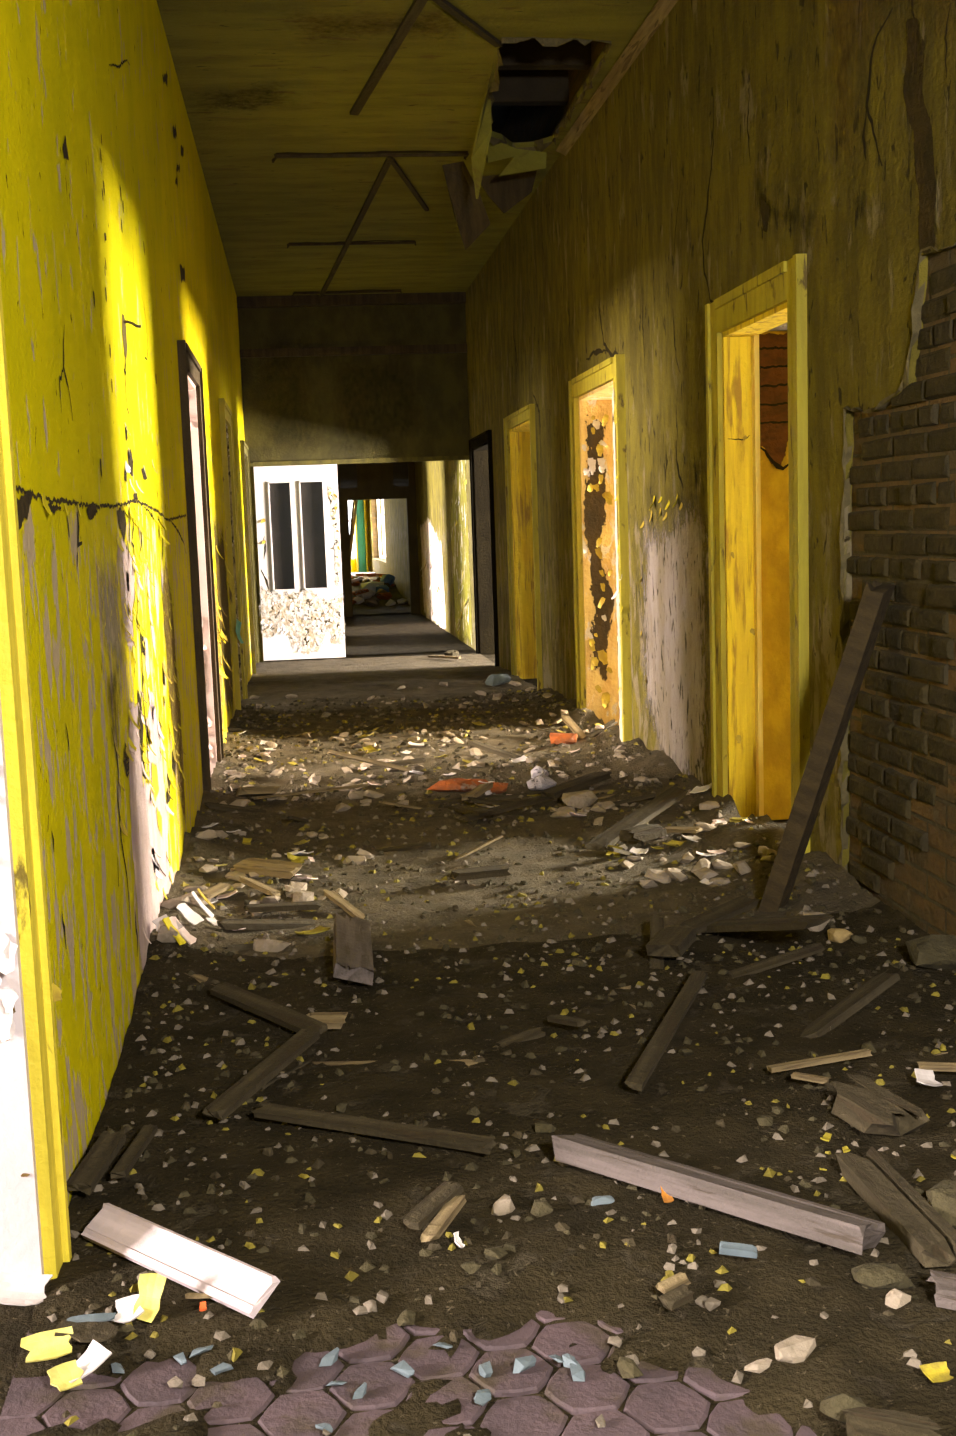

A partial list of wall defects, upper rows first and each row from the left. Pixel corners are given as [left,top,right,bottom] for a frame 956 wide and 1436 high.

crack [16,485,186,951]
peeling [117,537,186,970]
peeling [202,520,244,758]
peeling [259,486,345,655]
peeling [582,377,623,742]
peeling [640,494,710,786]
flaking render [837,0,956,896]
peeling [0,933,19,1042]